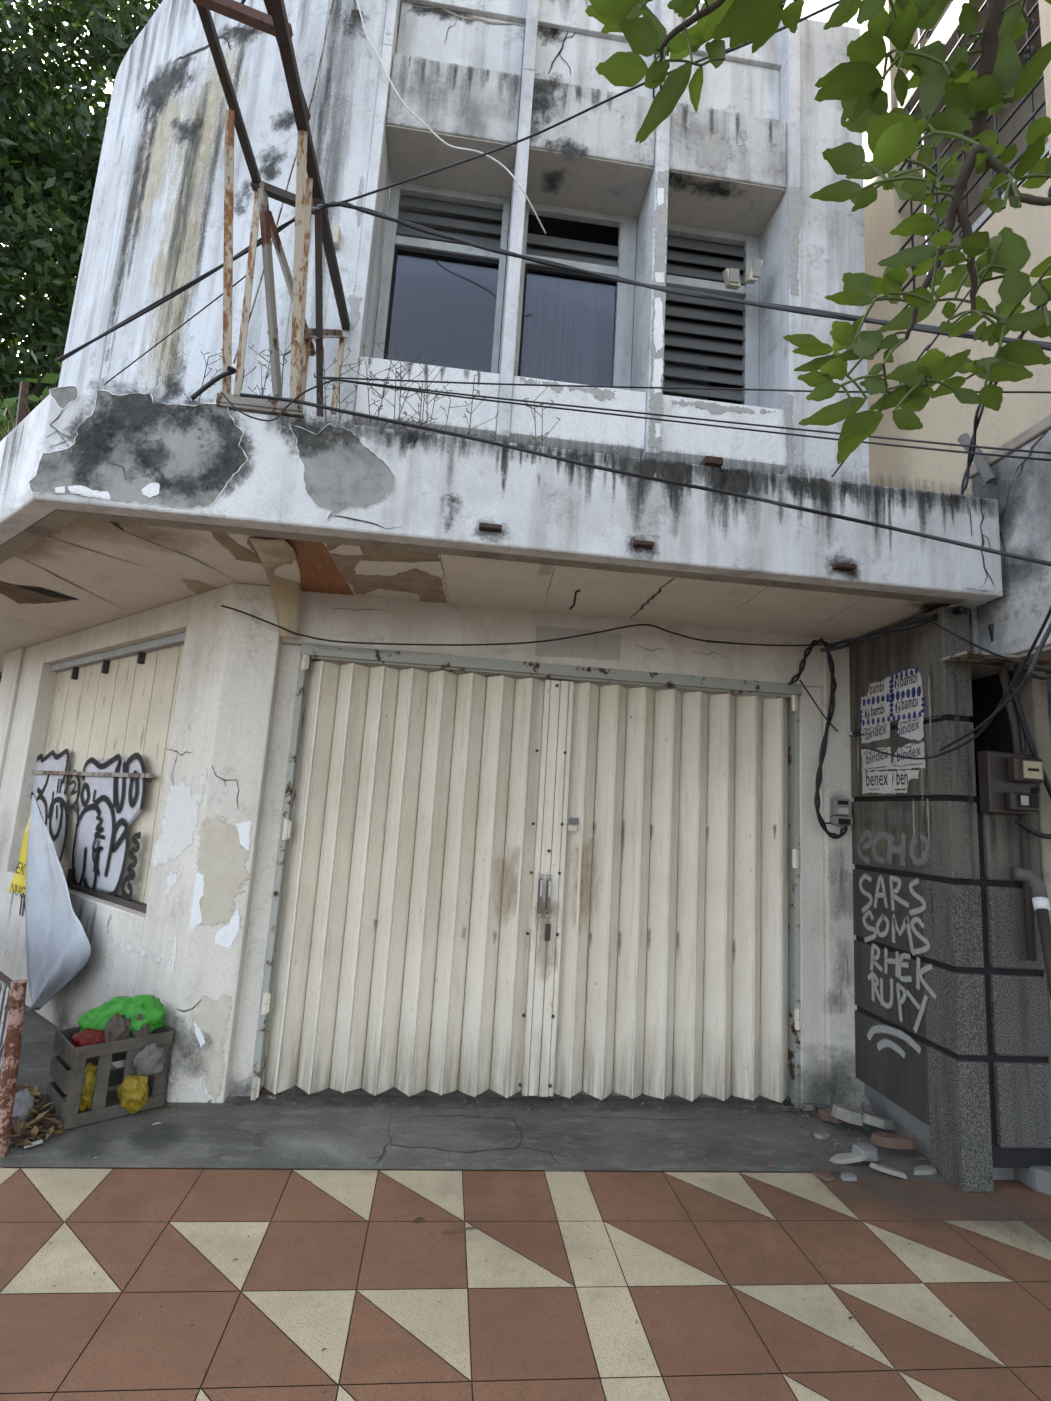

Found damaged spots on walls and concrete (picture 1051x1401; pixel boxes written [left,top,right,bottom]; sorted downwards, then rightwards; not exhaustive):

water stain [450,67,611,161]
water stain [111,26,243,396]
peeling [29,382,252,509]
peeling [282,418,402,529]
water stain [277,413,1021,536]
peeling [211,532,281,564]
peeling [326,543,448,603]
peeling [151,768,252,949]